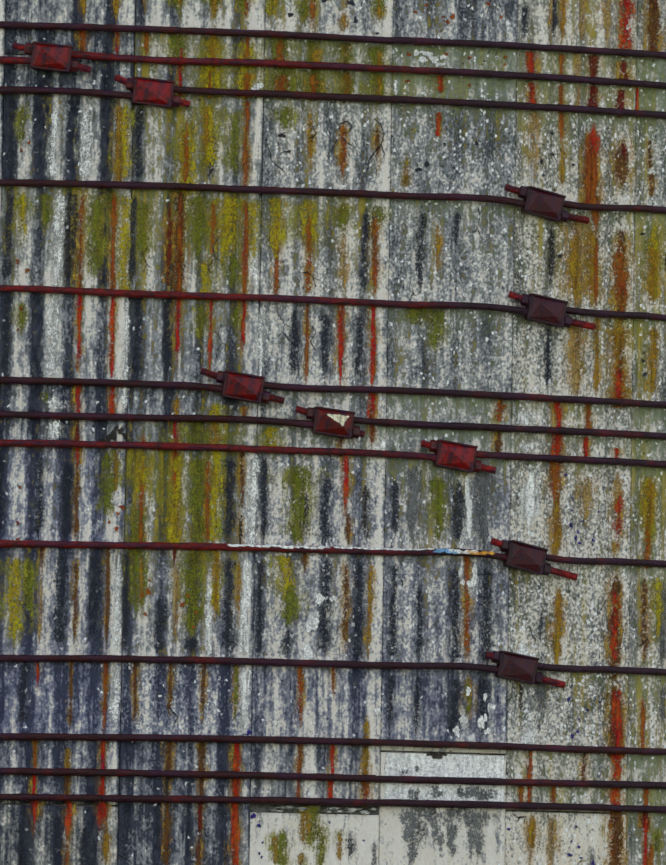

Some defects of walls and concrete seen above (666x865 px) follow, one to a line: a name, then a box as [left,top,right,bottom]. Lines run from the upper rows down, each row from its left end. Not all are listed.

rust [601,0,639,117]
rust [558,54,600,184]
water stain [2,188,14,278]
water stain [64,190,79,277]
rust [558,125,635,408]
water stain [222,459,237,538]
rust [547,402,568,555]
water stain [121,554,130,649]
water stain [153,596,167,651]
water stain [222,558,236,656]
rust [547,589,567,665]
rust [602,576,648,865]